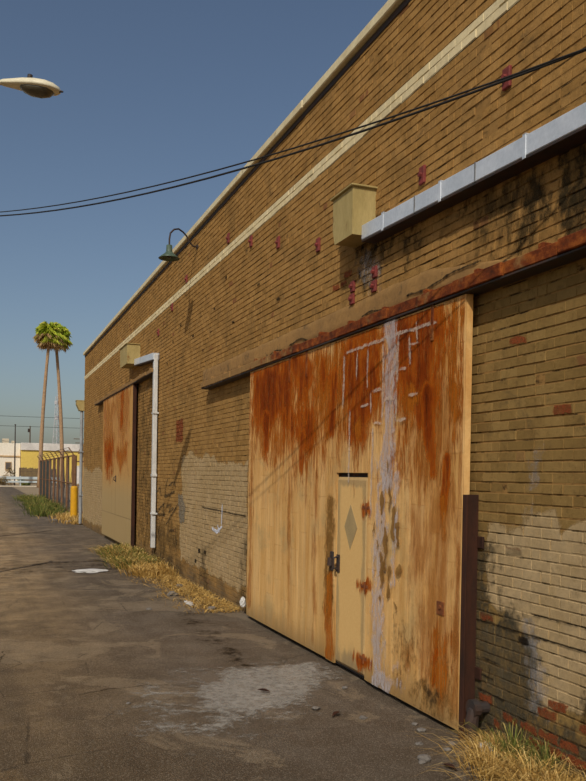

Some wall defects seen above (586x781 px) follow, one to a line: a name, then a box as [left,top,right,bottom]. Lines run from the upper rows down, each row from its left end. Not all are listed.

water stain [518,168,542,245]
water stain [559,143,586,235]
corrosion [104,388,128,480]
corrosion [249,299,464,708]
water stain [372,321,398,681]
water stain [475,544,586,781]
spalling [494,712,586,770]
spalling [538,700,568,720]